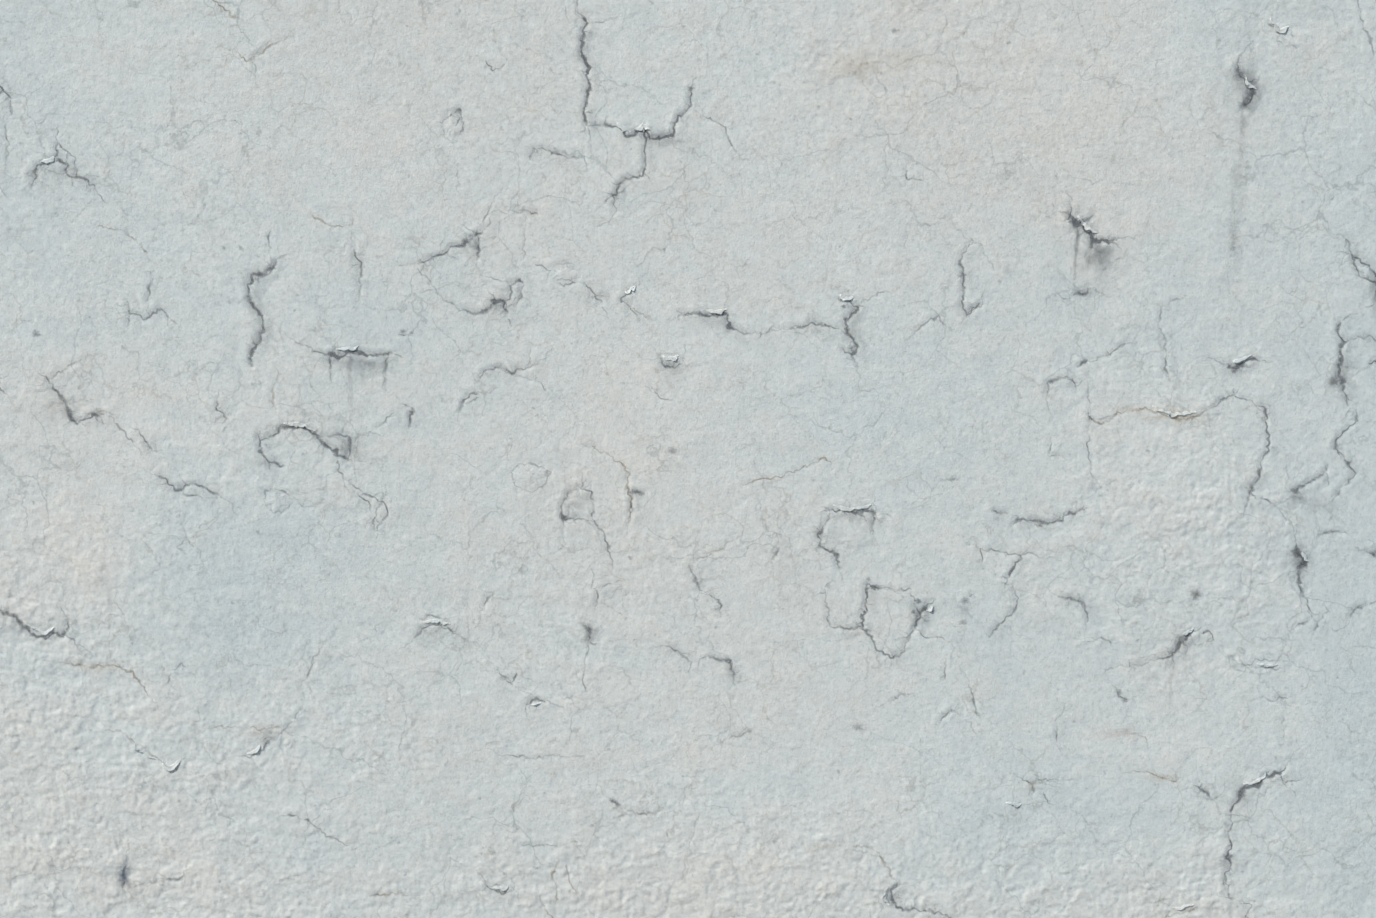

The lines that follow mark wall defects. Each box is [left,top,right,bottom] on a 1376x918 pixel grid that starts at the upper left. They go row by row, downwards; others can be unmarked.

crack [580,17,726,198]
crack [46,378,98,424]
crack [247,236,273,360]
crack [258,422,351,467]
crack [314,346,389,363]
crack [482,280,521,312]
crack [688,308,734,330]
crack [803,294,859,355]
crack [1086,396,1309,500]
crack [1335,322,1374,472]
crack [817,504,933,658]
crack [1202,769,1285,874]